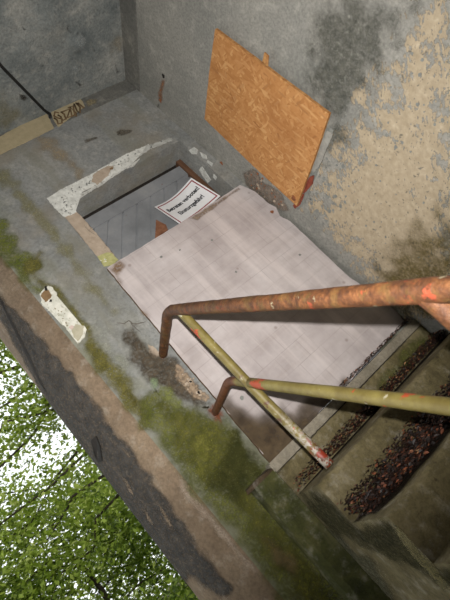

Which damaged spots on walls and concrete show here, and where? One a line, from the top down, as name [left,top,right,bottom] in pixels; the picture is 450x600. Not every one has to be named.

damp [309,0,381,114]
peeling [244,0,450,283]
damp [123,332,204,408]
flaking render [175,364,209,402]
damp [218,404,294,506]
damp [287,398,331,430]